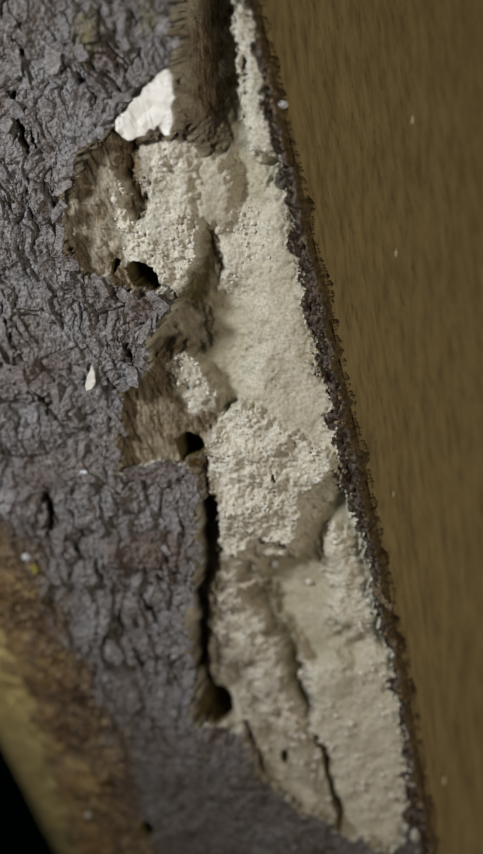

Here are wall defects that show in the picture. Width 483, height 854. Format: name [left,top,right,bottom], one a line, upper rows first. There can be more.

crack [10,14,25,56]
crack [5,90,38,155]
crack [0,274,23,361]
crack [117,336,135,363]
peeling [48,0,415,854]